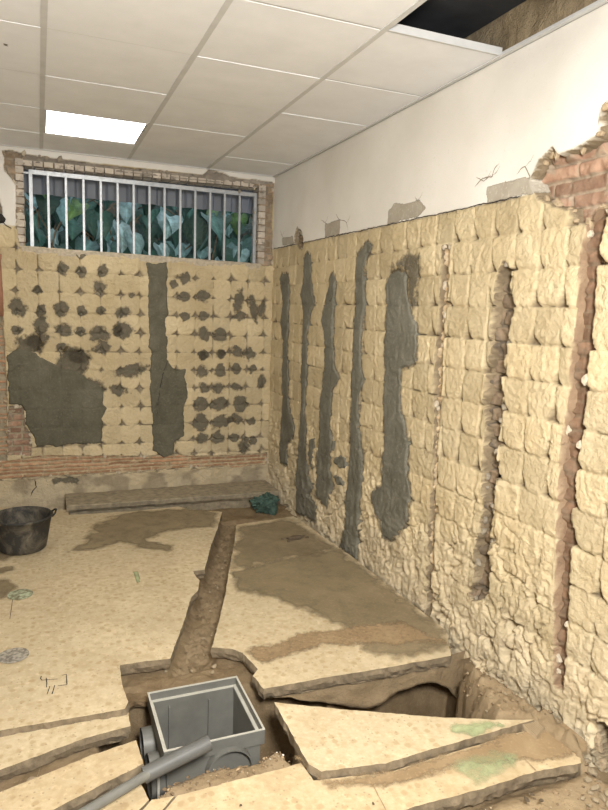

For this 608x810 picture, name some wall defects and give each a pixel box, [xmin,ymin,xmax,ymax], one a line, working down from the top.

spalling [2,150,274,266]
peeling [282,226,304,249]
peeling [388,200,426,224]
flaking render [486,130,608,238]
flaking render [0,404,267,479]
leakage [231,240,448,662]
leakage [73,509,216,551]
leakage [0,553,17,598]